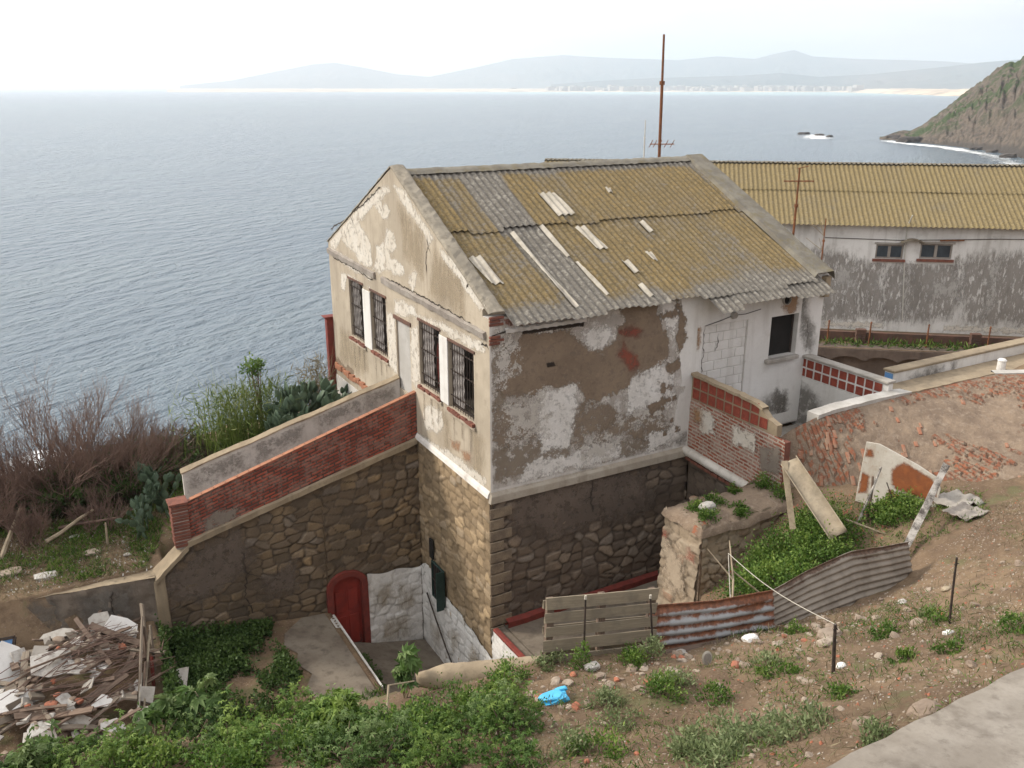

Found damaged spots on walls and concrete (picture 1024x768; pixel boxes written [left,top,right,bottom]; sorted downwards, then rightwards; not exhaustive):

flaking render [330,184,688,487]
damp [783,250,1024,347]